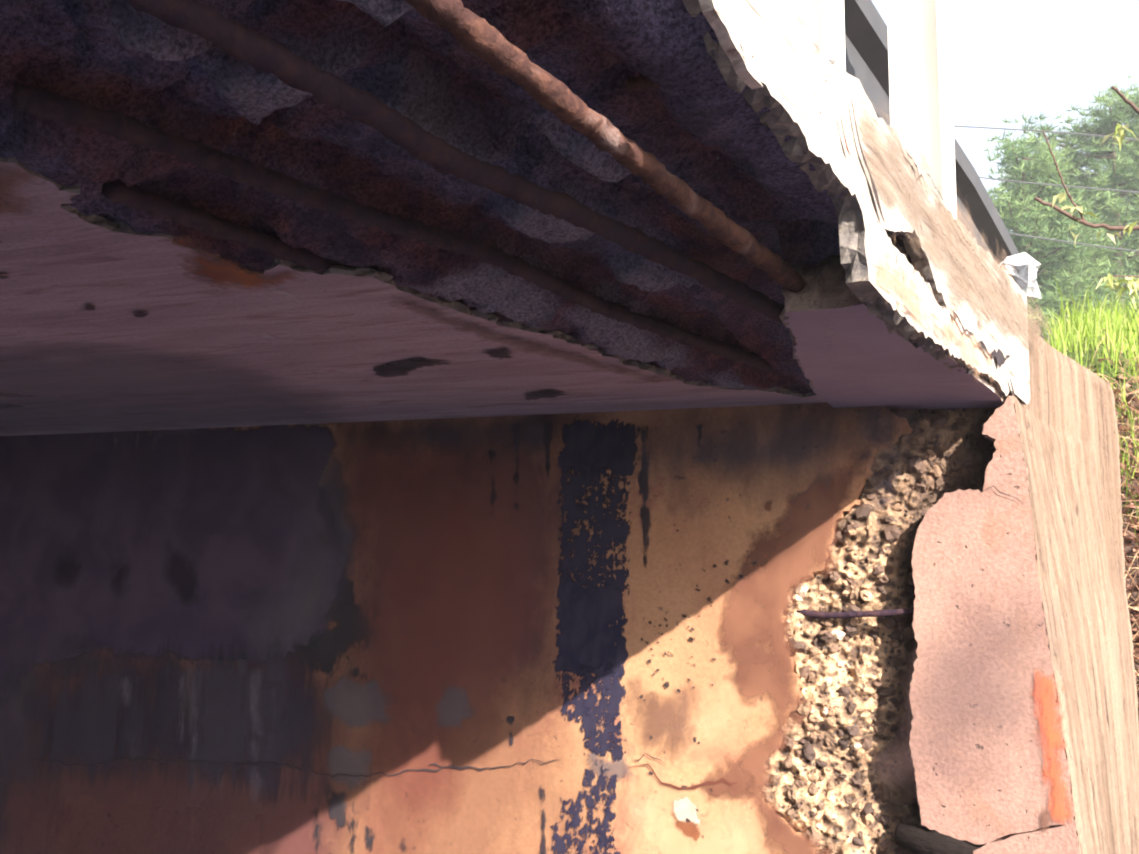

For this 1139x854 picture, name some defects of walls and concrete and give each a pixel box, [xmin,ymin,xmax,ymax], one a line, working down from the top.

spalling [0,0,842,395]
spalling [886,233,912,265]
water stain [674,405,838,469]
water stain [0,469,377,805]
spalling [641,618,695,692]
spalling [764,407,999,854]
crack [34,757,555,777]
crack [624,753,738,798]
water stain [313,784,374,854]
spalling [673,786,704,841]